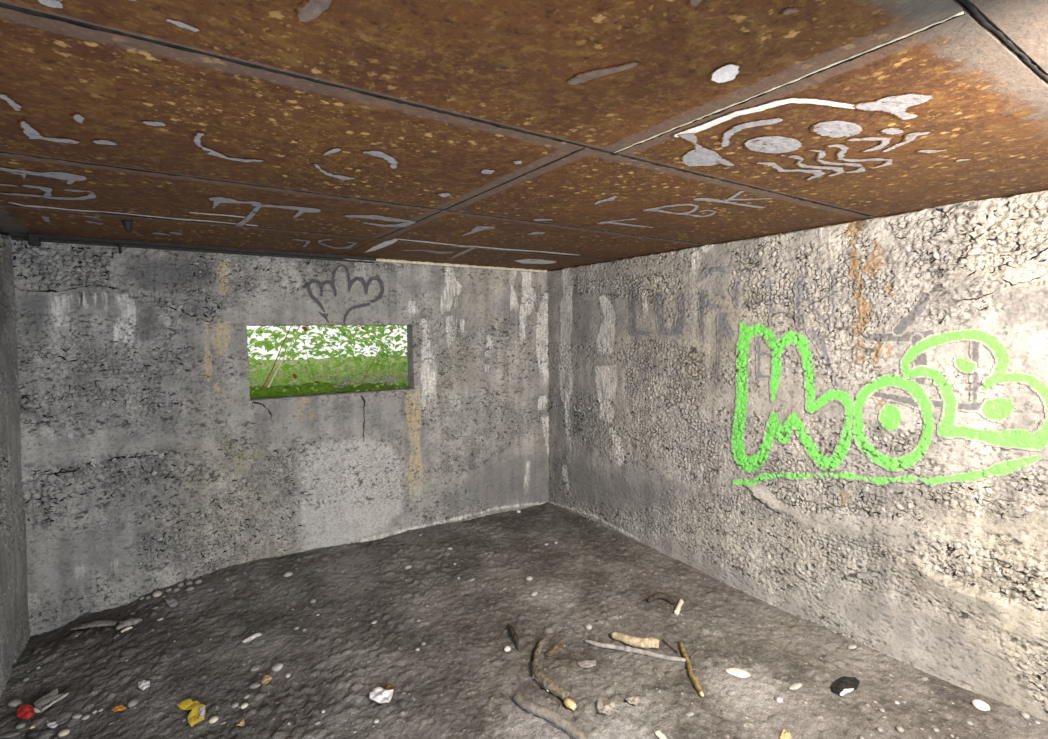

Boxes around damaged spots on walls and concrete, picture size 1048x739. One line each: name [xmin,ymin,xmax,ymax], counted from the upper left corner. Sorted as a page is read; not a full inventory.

water stain [689,243,719,291]
rust [841,219,898,377]
water stain [421,267,818,543]